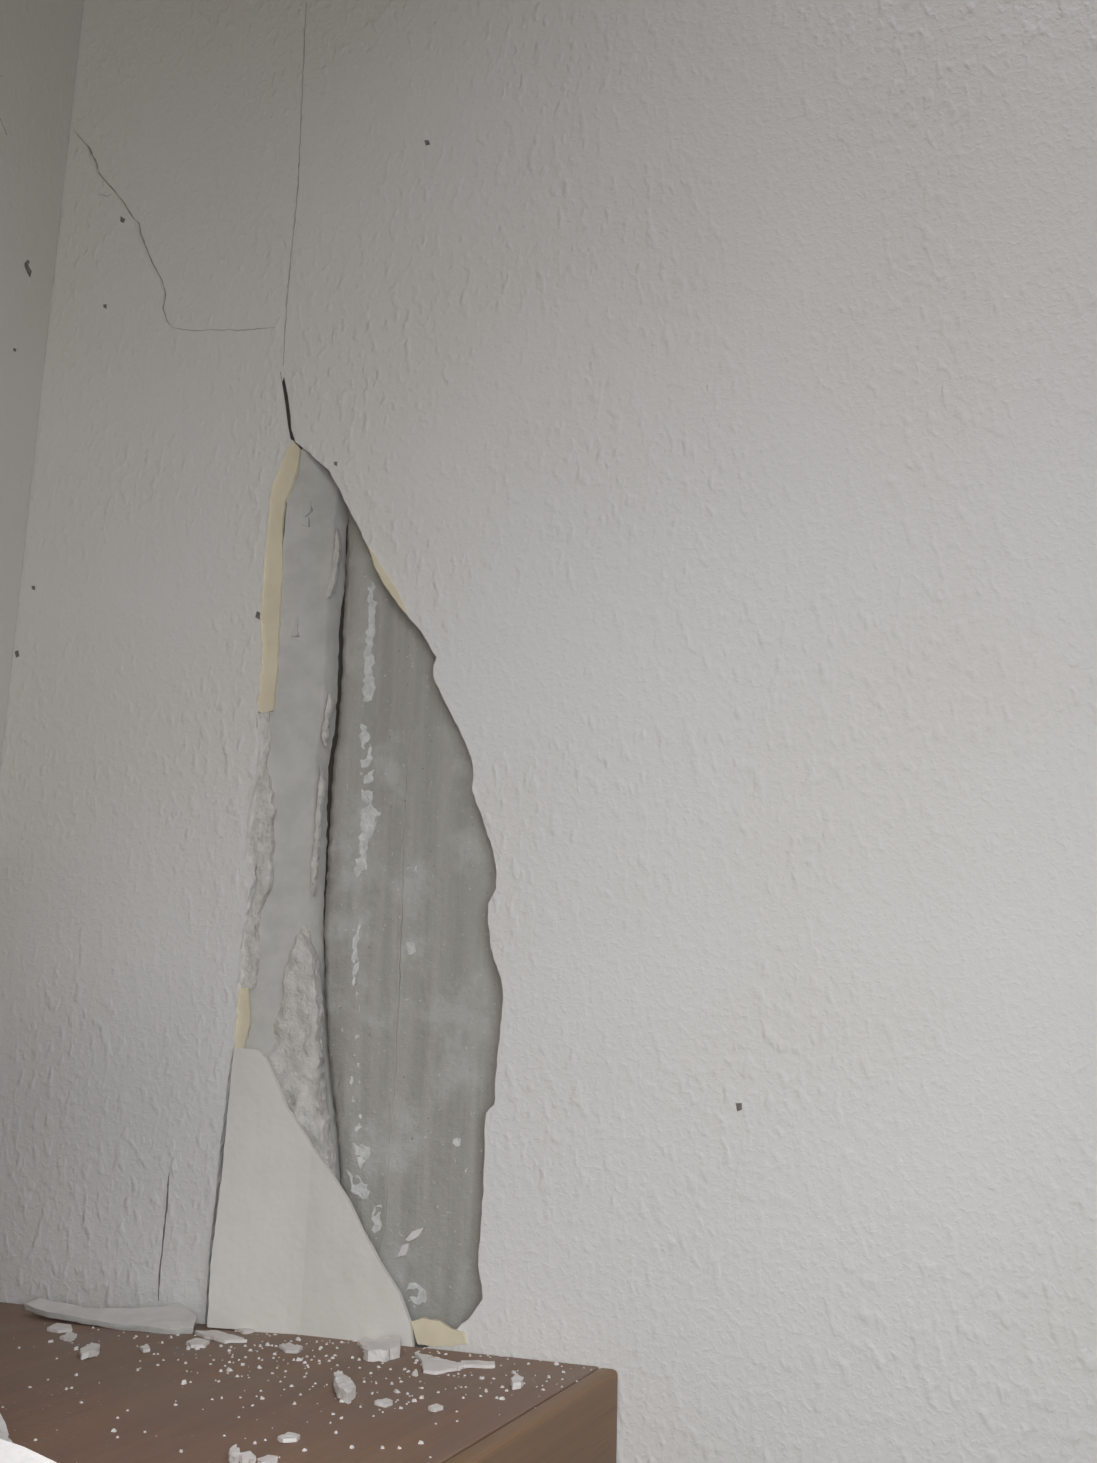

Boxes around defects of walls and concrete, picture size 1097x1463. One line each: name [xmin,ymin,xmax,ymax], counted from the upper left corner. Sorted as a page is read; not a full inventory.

crack [72,12,306,441]
spalling [235,443,503,1375]
spalling [333,1371,356,1404]
spalling [374,1398,393,1408]
spalling [511,1373,524,1390]